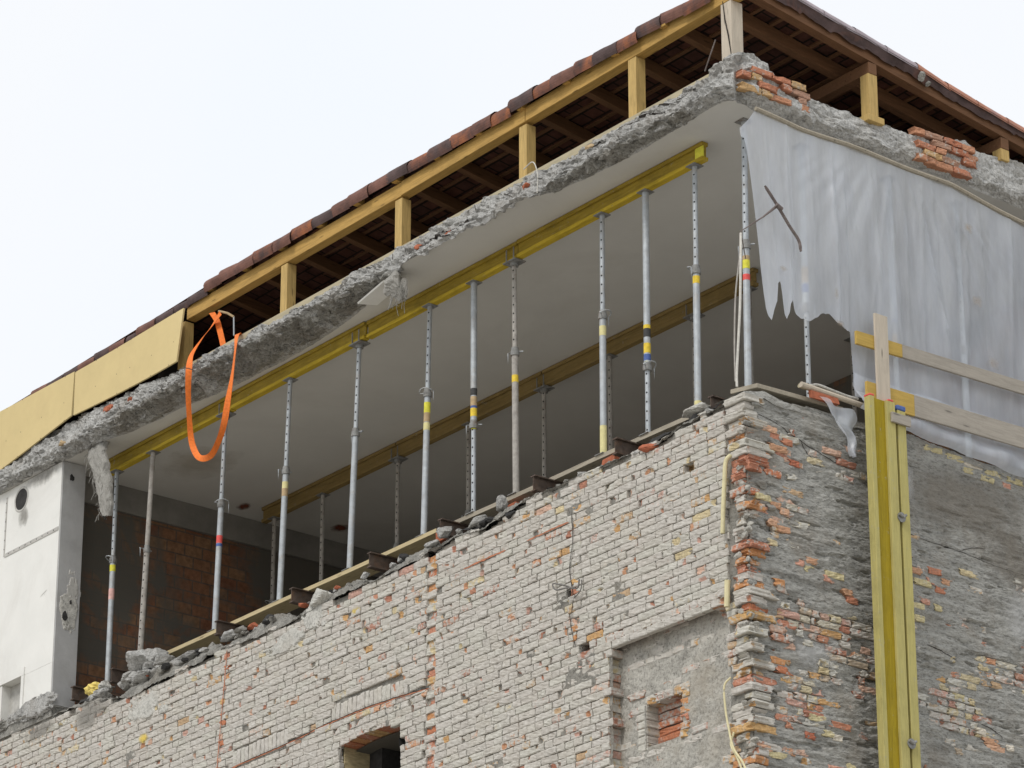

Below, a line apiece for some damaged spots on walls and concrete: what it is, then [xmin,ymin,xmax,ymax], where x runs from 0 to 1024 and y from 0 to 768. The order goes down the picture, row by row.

flaking render [735,66,811,113]
spalling [522,110,695,199]
flaking render [907,126,978,181]
flaking render [761,425,800,469]
flaking render [753,492,791,534]
flaking render [59,570,81,634]
flaking render [795,556,859,606]
flaking render [912,566,950,623]
flaking render [804,713,852,743]
flaking render [974,727,1015,753]